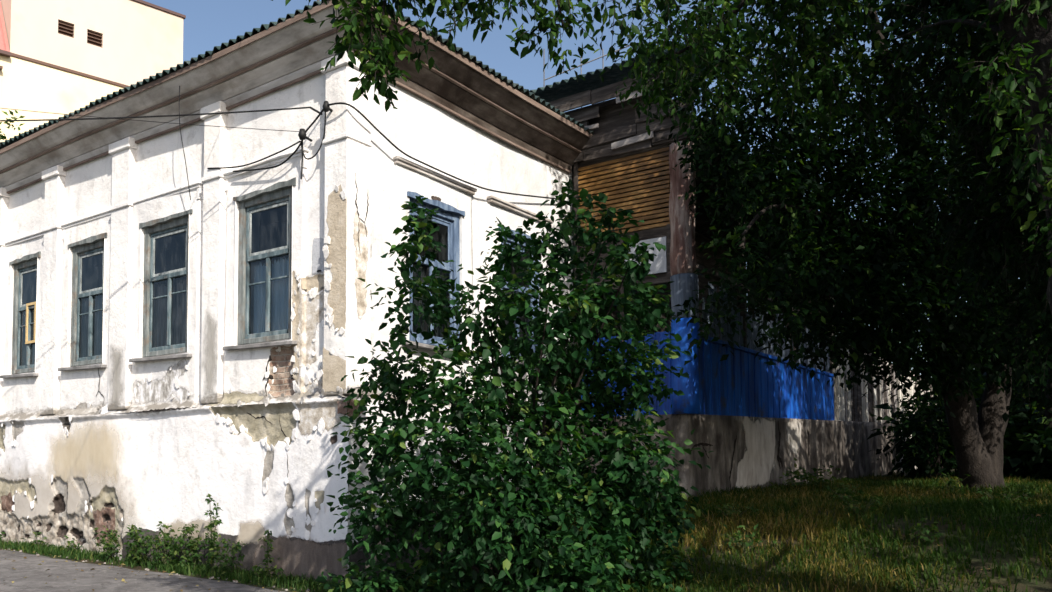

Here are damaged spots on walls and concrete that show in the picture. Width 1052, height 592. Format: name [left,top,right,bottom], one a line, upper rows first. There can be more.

crack [355,173,369,249]
flaking render [207,184,368,494]
spalling [0,420,24,454]
spalling [58,402,102,436]
spalling [0,474,124,557]
water stain [0,425,128,539]
flaking render [284,478,325,540]